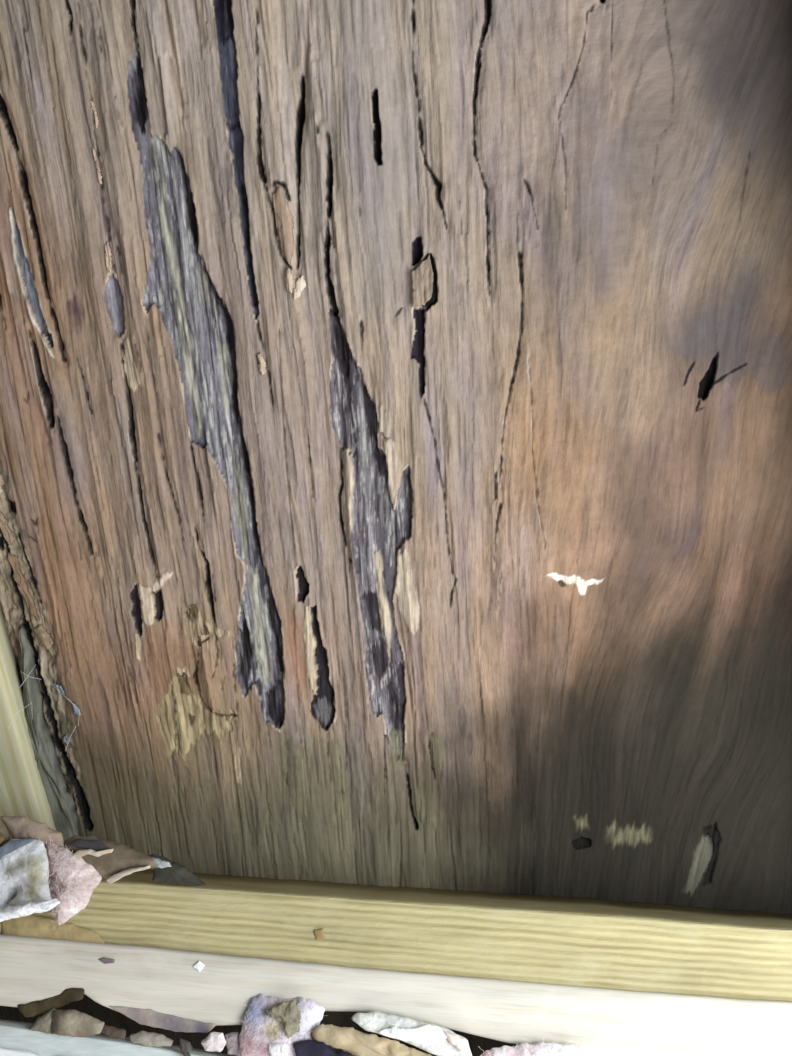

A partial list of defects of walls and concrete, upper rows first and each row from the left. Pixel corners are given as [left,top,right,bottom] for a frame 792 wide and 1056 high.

crack [411,0,447,228]
crack [472,0,491,294]
crack [566,0,613,97]
crack [0,95,93,554]
crack [494,253,533,560]
crack [684,362,747,412]
crack [424,399,457,607]
peeling [0,510,54,650]
peeling [177,666,190,695]
peeling [184,603,233,657]
spalling [547,573,604,595]